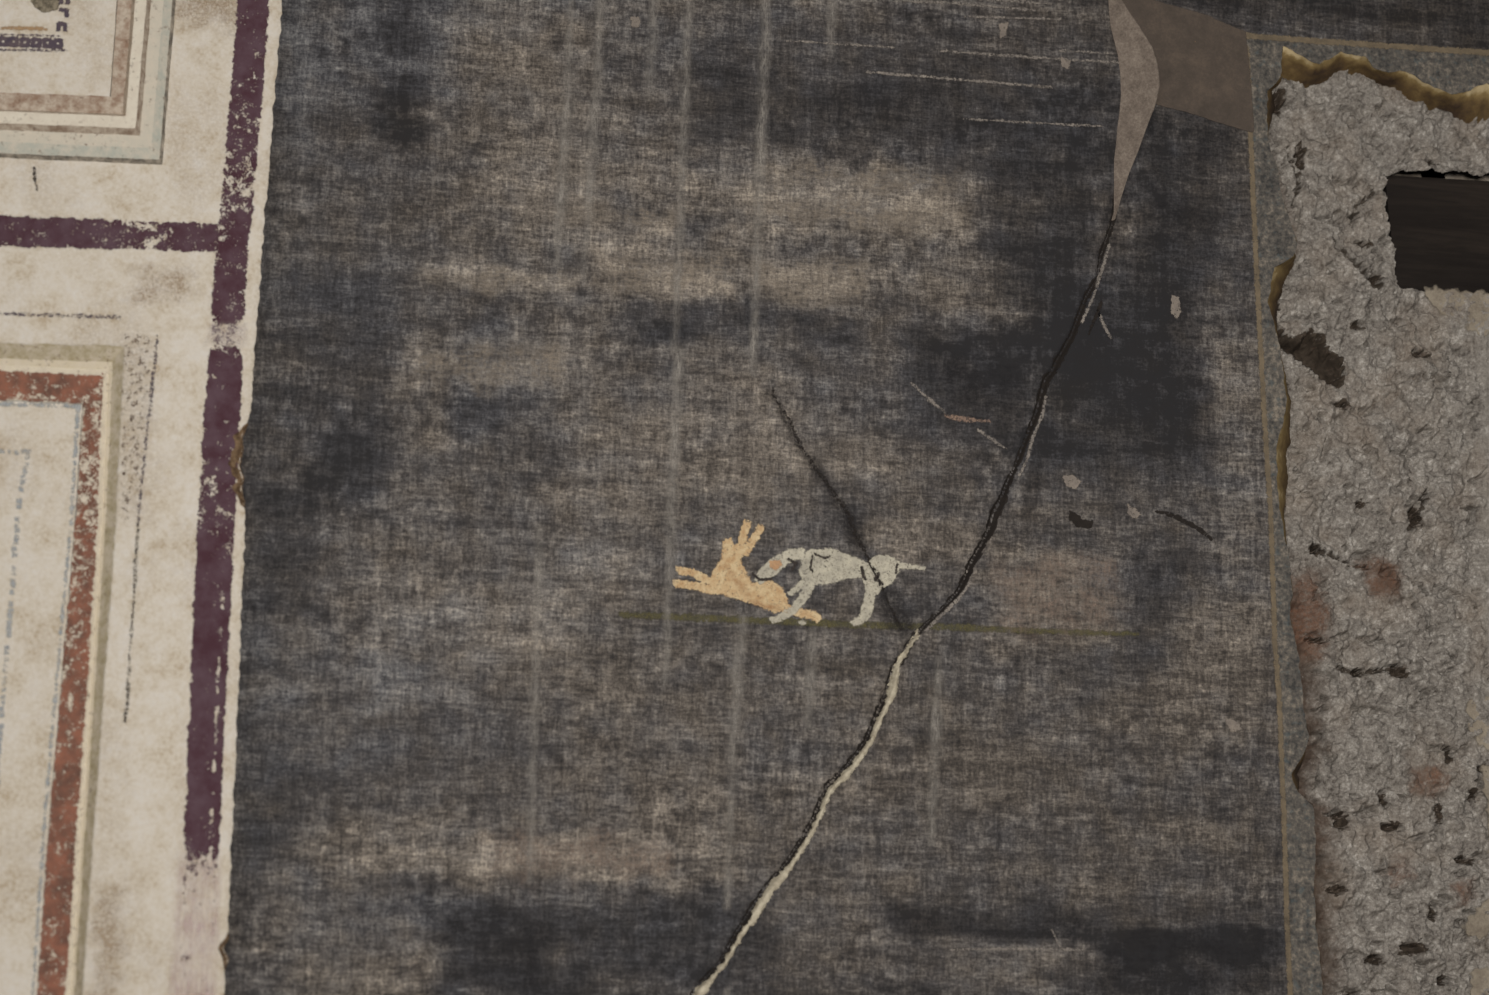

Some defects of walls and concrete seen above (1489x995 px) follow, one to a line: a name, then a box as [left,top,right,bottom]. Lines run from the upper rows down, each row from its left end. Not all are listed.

flaking render [1122,0,1489,171]
peeling [1171,295,1181,318]
spalling [1268,225,1350,545]
spalling [1127,503,1213,541]
spalling [1407,506,1423,529]
crack [690,195,1117,995]
spalling [1389,663,1410,678]
spalling [1292,722,1349,830]
spalling [1378,794,1401,832]
spalling [1433,803,1443,824]
spalling [1314,884,1347,897]
spalling [1364,942,1429,965]